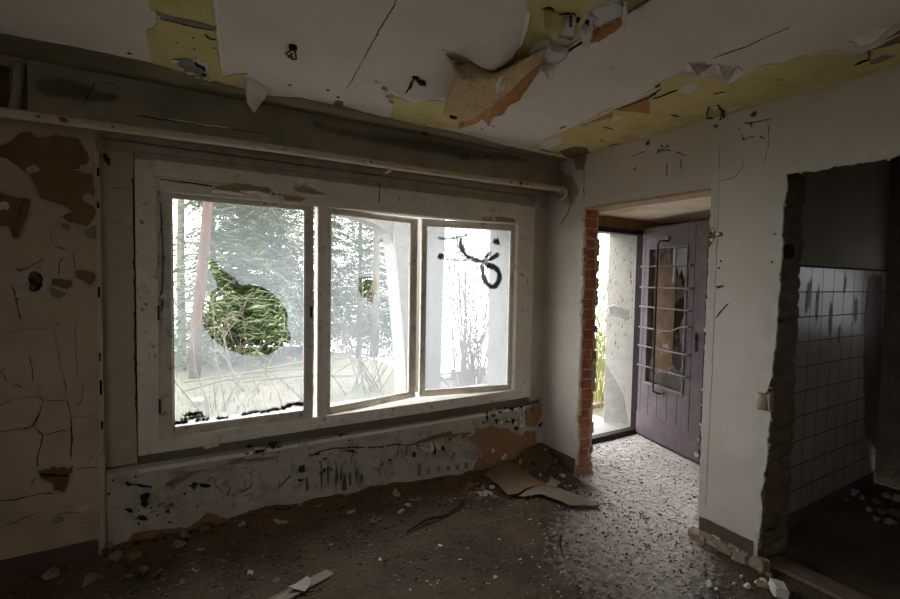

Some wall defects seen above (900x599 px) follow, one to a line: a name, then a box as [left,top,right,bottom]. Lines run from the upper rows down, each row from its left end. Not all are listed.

peeling [147,0,224,86]
crack [346,0,396,89]
peeling [517,0,650,80]
peeling [382,86,464,129]
peeling [529,30,900,170]
flaking render [0,129,101,242]
peeling [211,174,330,207]
flaking render [531,172,806,599]
crack [0,410,98,527]
flaking render [112,442,282,542]
flaking render [412,396,543,471]